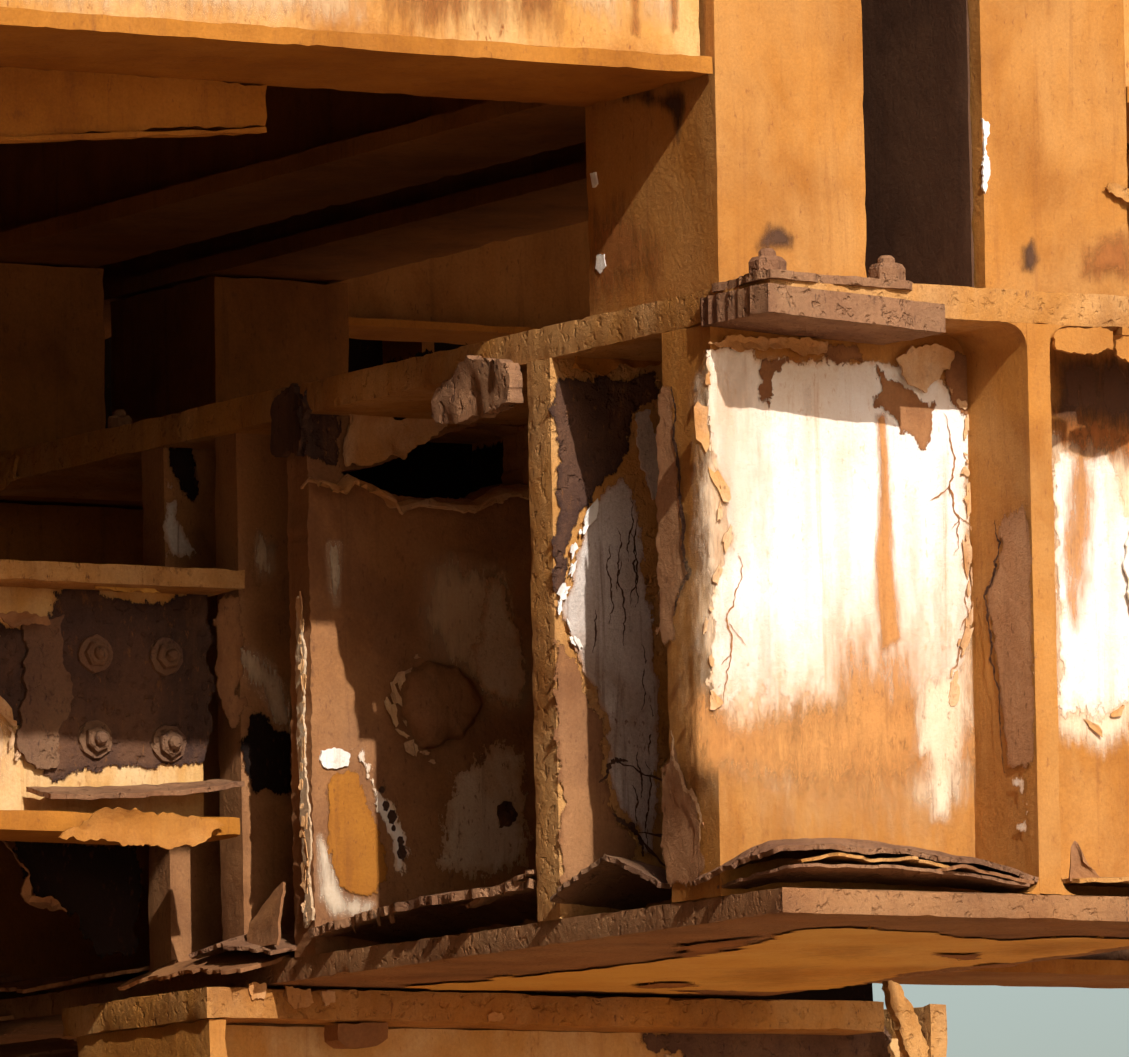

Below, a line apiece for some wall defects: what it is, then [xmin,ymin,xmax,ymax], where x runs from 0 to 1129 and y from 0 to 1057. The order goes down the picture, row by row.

peeling [595,254,606,274]
crack [930,415,970,553]
peeling [693,269,1037,794]
peeling [1052,430,1129,748]
peeling [0,370,1039,1000]
crack [599,757,662,783]
crack [612,813,667,868]
peeling [284,986,336,1009]
peeling [0,1015,78,1057]
peeling [643,1025,892,1057]